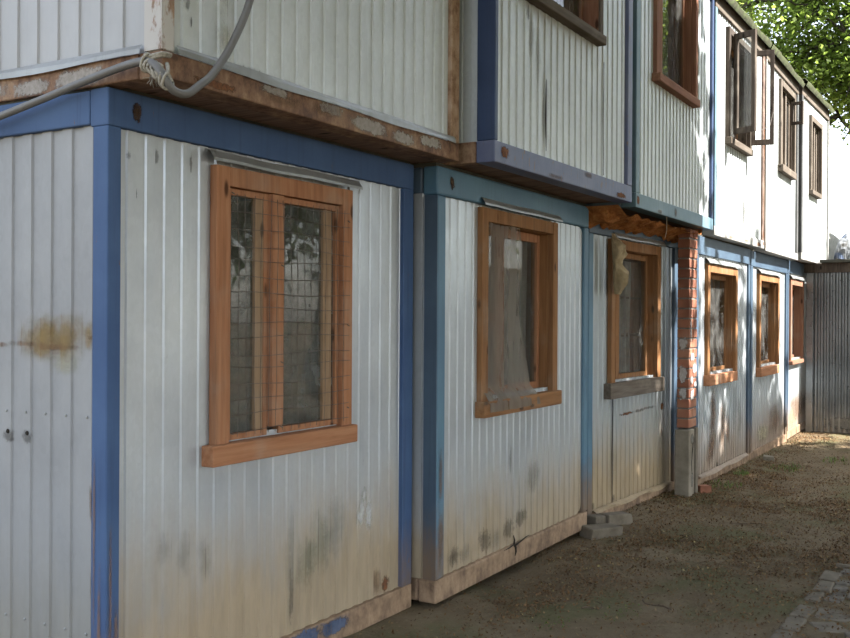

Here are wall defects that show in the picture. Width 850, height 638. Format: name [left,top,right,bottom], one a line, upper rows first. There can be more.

corrosion [133,103,141,123]
peeling [292,616,349,638]